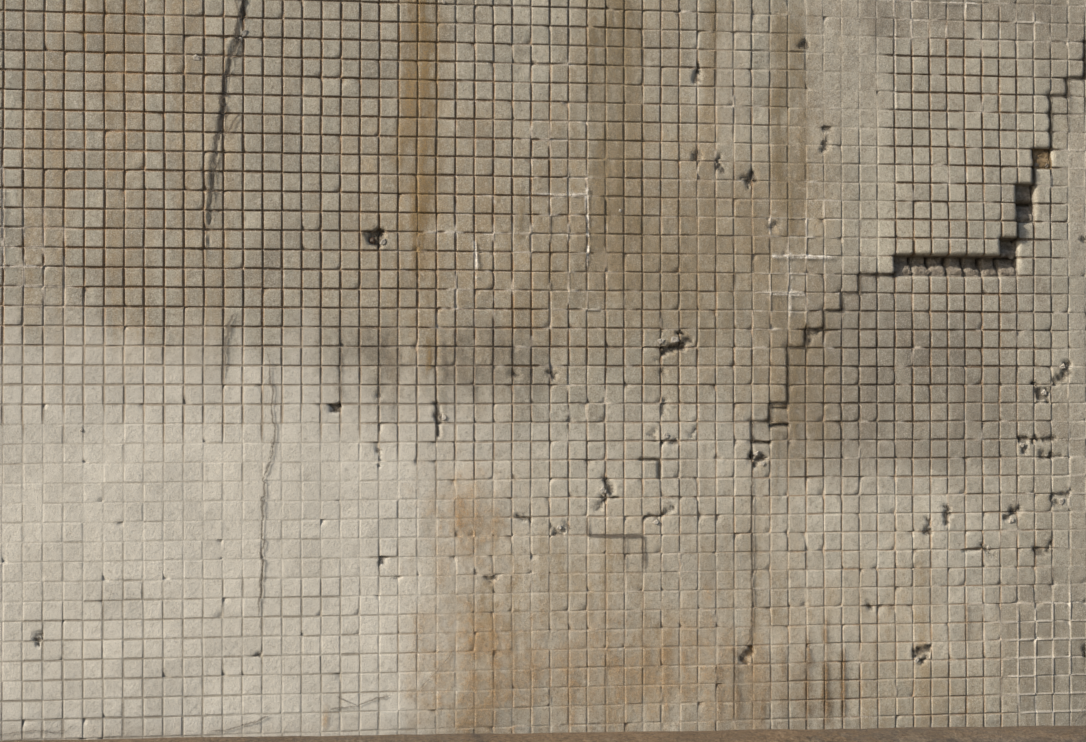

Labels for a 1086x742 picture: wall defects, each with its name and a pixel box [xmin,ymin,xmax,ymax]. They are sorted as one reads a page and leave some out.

crack [207,0,247,224]
spalling [368,229,386,248]
rust [398,0,438,256]
peeling [893,239,1017,277]
peeling [1015,185,1034,223]
peeling [1031,149,1052,169]
crack [1050,41,1086,140]
spalling [657,331,692,355]
crack [751,273,894,439]
crack [258,360,276,608]
spalling [1018,435,1061,459]
crack [734,478,755,685]